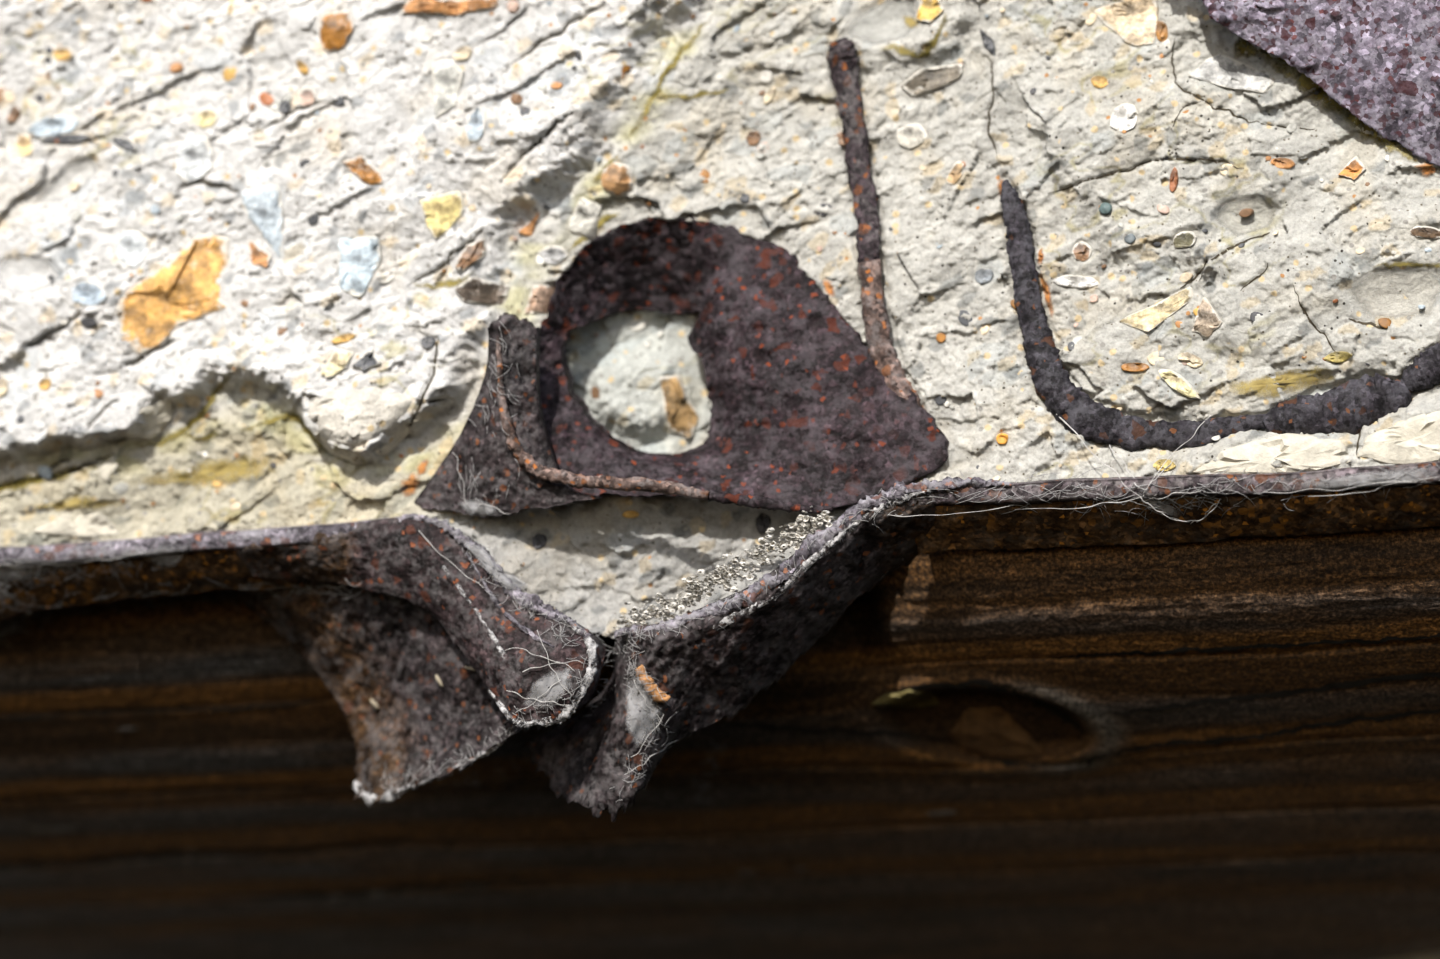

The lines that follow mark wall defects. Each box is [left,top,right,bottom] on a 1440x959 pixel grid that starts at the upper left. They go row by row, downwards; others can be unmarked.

crack [500,1,605,76]
crack [1048,38,1315,194]
crack [175,181,241,193]
crack [499,111,574,183]
corrosion [1418,163,1435,175]
corrosion [1038,249,1052,310]
crack [1180,232,1387,351]
crack [0,338,175,492]
peeling [120,399,174,440]
peeling [91,456,119,482]
peeling [32,513,120,537]
corrosion [635,665,670,703]